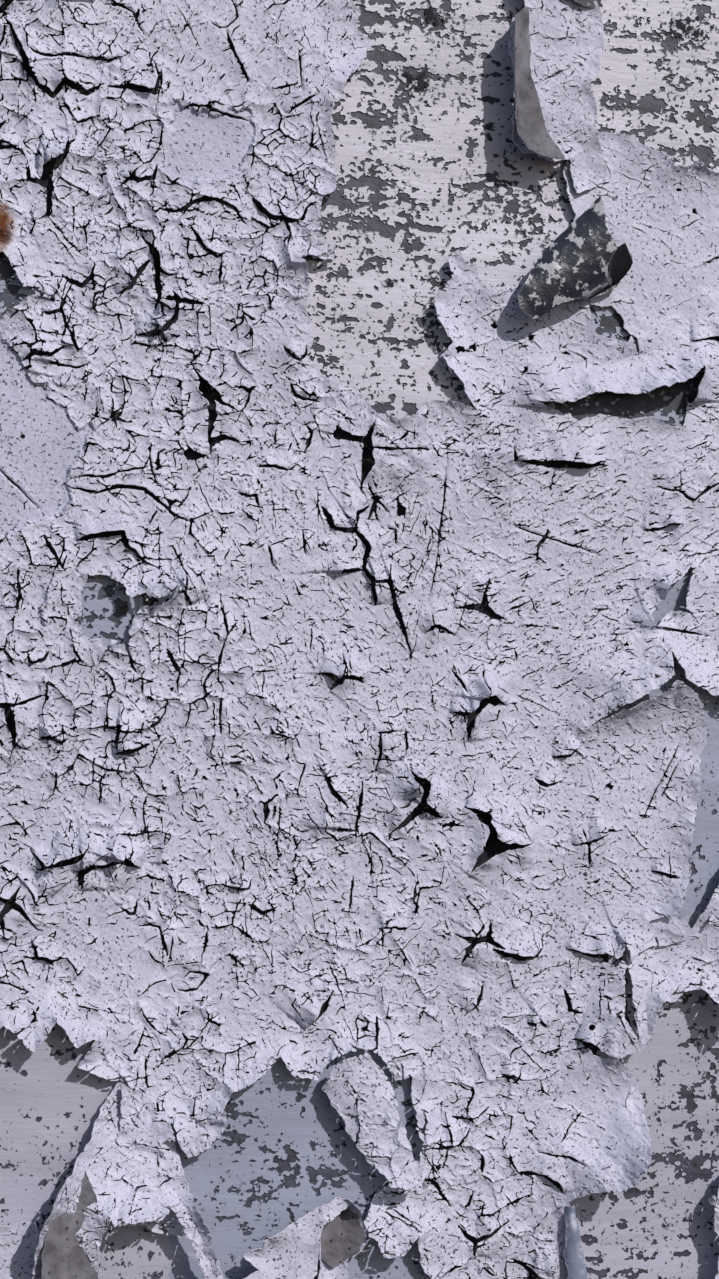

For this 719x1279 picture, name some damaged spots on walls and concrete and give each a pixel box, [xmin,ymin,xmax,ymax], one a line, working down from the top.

crack [0,0,249,121]
corrosion [0,205,13,249]
peeling [0,237,60,333]
crack [21,165,314,369]
peeling [282,0,719,444]
crack [0,448,237,750]
peeling [61,559,200,666]
crack [187,346,510,653]
crack [0,836,209,993]
crack [274,729,531,912]
peeling [552,544,719,1279]
peeling [0,996,457,1279]